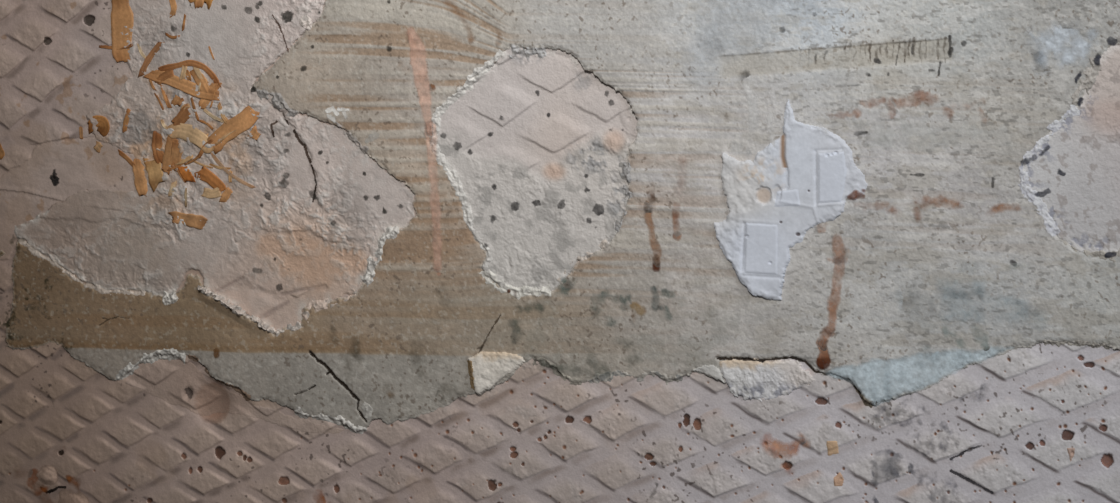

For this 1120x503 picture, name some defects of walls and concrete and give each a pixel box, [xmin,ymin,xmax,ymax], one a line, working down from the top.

spalling [14,0,415,337]
crack [270,113,317,202]
spalling [429,45,637,300]
spalling [1018,43,1120,263]
corrosion [645,195,661,271]
spalling [116,348,373,434]
crack [295,351,367,422]
peeling [467,351,816,402]
corrosion [816,290,837,369]
spalling [856,390,873,408]
spalling [1043,339,1114,368]